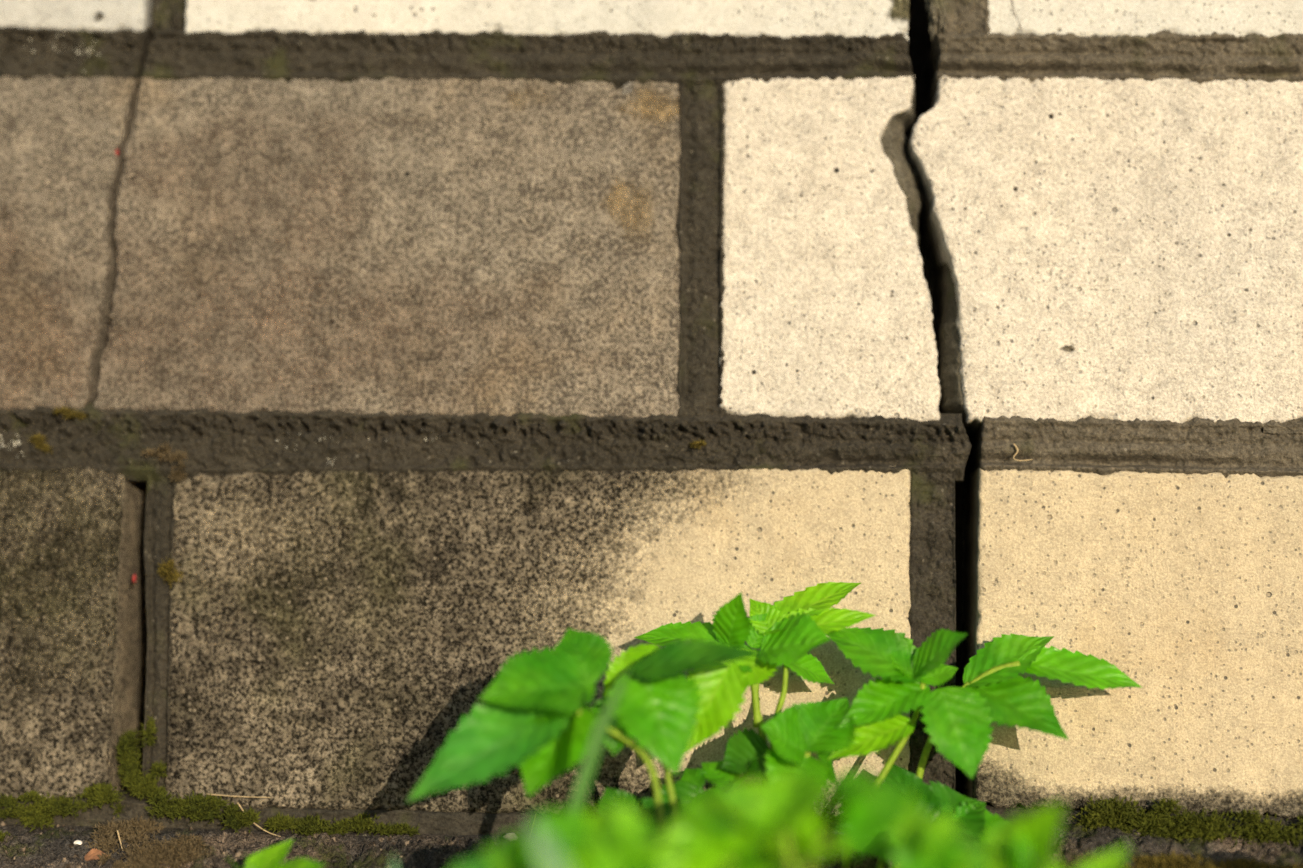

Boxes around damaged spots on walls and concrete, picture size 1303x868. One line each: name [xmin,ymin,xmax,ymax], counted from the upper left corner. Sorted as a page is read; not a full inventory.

crack [881,0,975,687]
leakage [0,464,123,801]
leakage [165,469,731,814]
leakage [819,786,840,821]
crack [954,765,962,792]